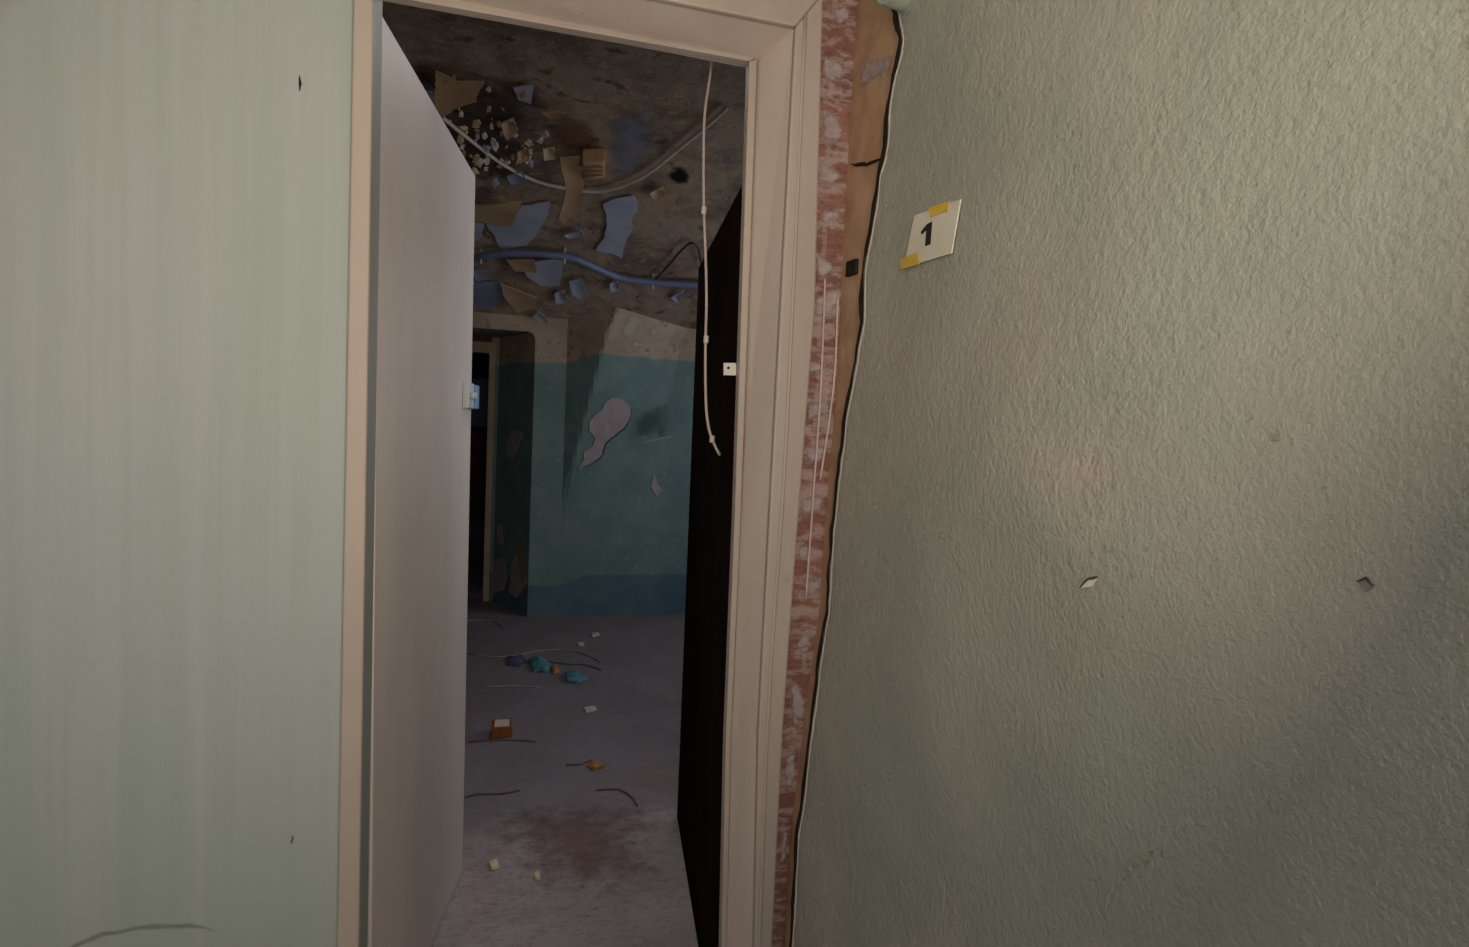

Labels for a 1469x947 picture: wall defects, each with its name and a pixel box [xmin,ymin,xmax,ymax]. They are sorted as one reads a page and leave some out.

peeling [578,398,632,471]